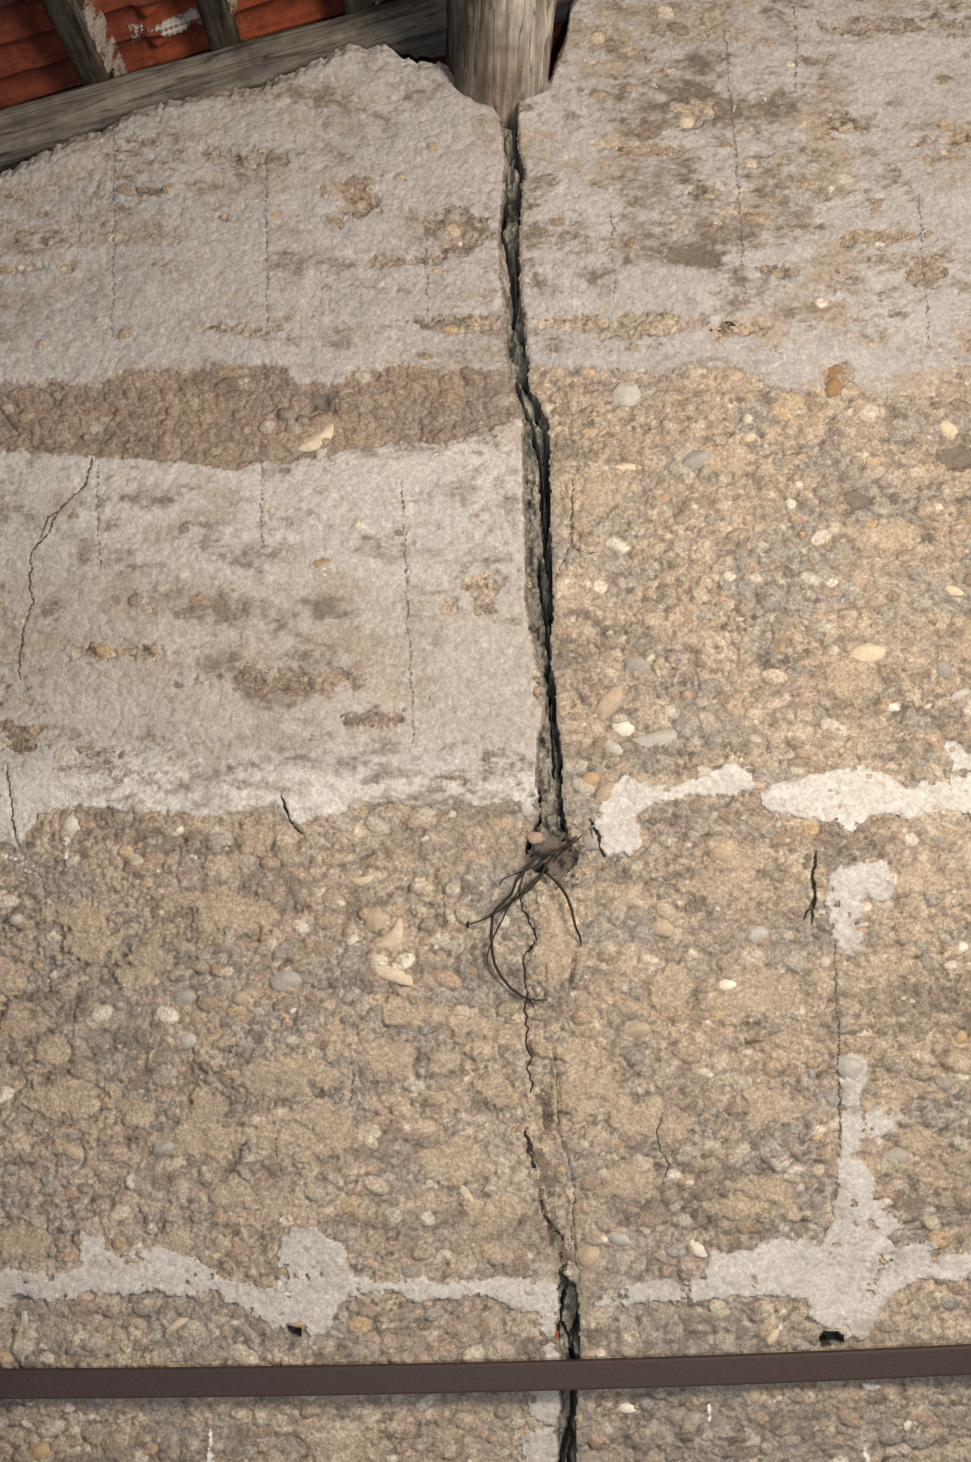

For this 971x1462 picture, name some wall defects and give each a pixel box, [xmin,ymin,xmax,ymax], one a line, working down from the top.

crack [18,457,93,680]
crack [499,120,606,1462]
damp [206,1428,215,1462]